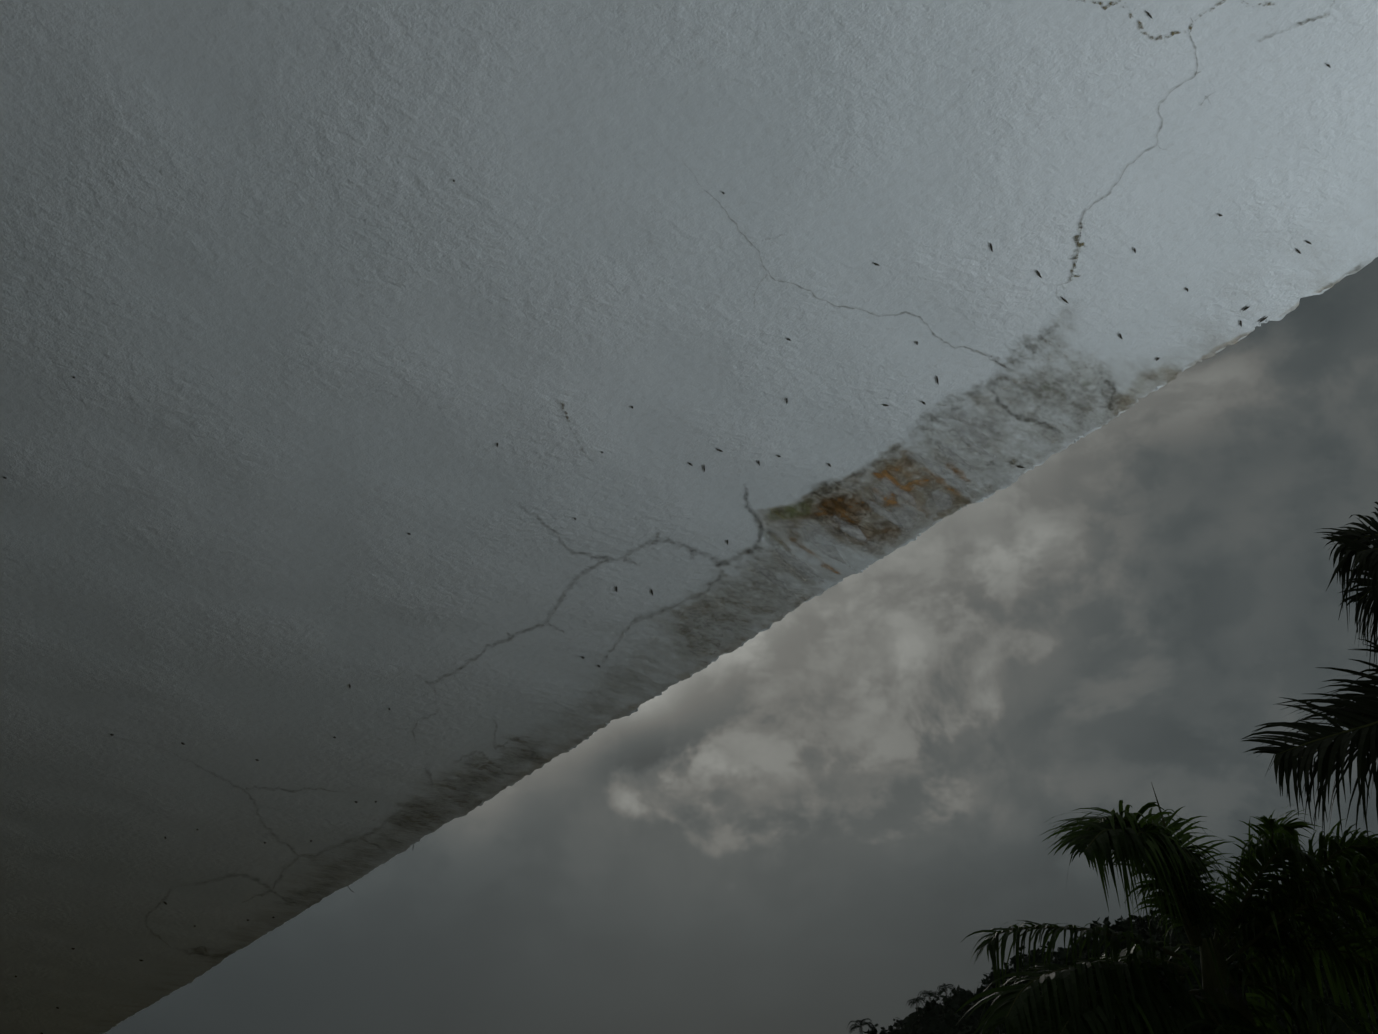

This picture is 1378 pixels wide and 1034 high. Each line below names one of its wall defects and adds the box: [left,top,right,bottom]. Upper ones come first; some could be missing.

crack [1093,2,1222,65]
crack [1071,223,1084,277]
corrosion [775,438,990,574]